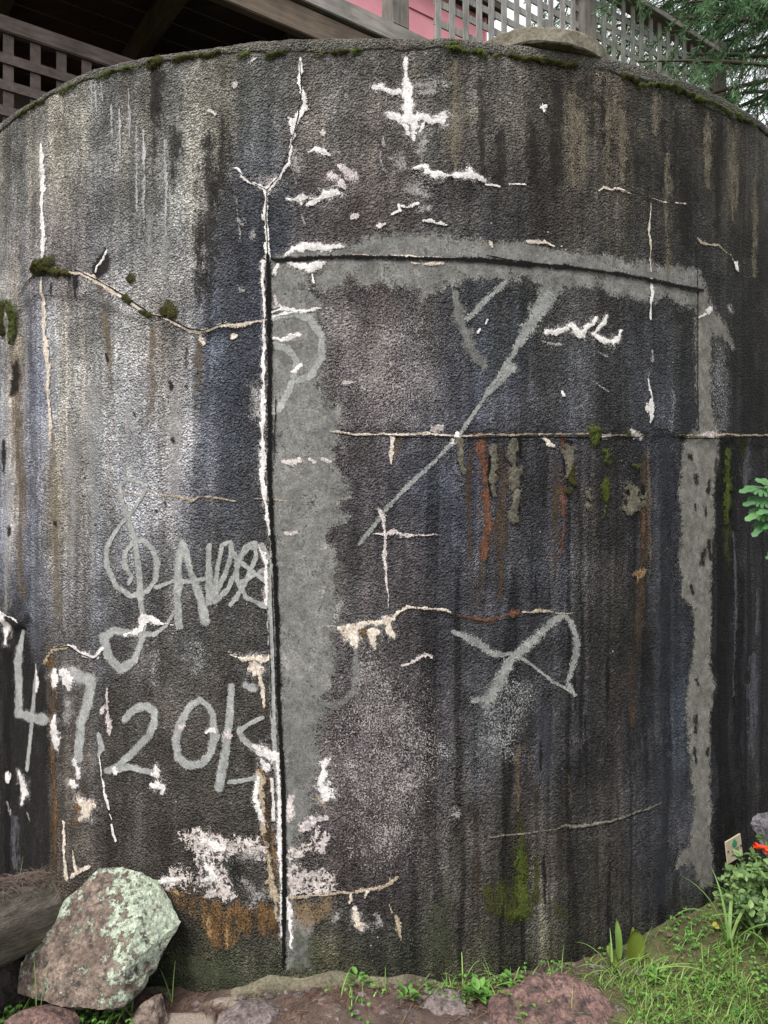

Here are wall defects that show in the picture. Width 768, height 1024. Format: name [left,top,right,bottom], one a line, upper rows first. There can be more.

crack [233,57,309,260]
water stain [750,172,759,277]
crack [17,267,321,432]
crack [330,350,768,447]
crack [43,613,173,664]
crack [375,508,573,623]
corrosion [464,429,508,613]
water stain [709,337,760,889]
water stain [149,762,170,795]
corrosion [167,767,335,952]
water stain [155,586,543,951]
water stain [533,784,562,914]